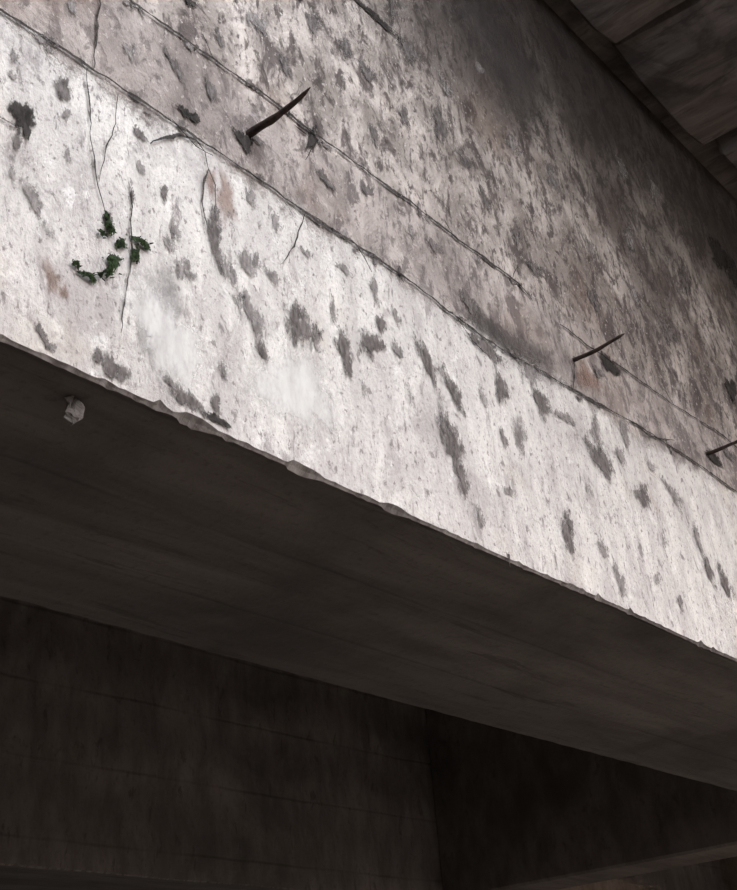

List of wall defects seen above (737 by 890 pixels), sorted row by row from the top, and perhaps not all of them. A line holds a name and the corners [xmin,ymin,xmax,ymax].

spalling [163,219,197,281]
peeling [203,205,281,363]
peeling [284,299,324,351]
peeling [330,277,403,394]
crack [0,0,737,492]
damp [415,335,469,499]
damp [500,412,528,455]
damp [473,315,576,427]
spalling [0,323,737,661]
damp [562,510,576,559]
damp [598,534,628,597]
damp [694,525,733,598]